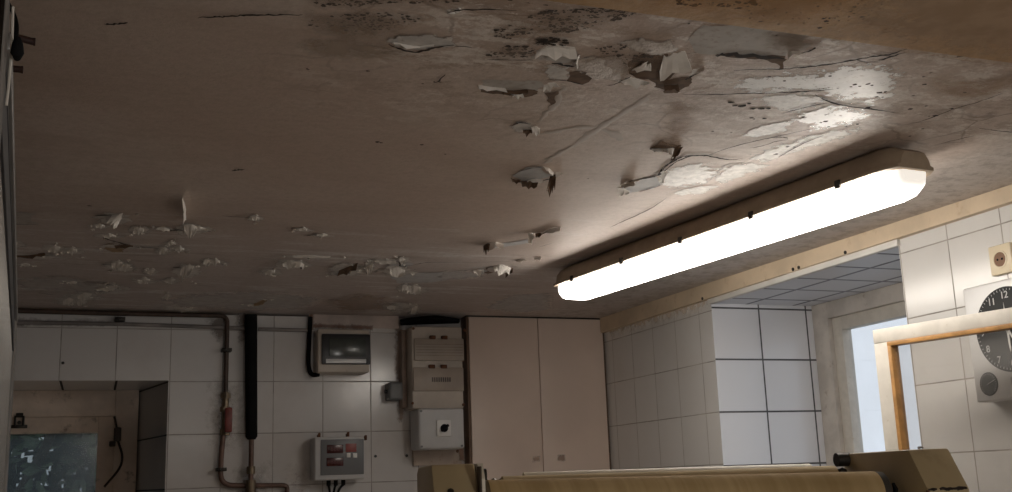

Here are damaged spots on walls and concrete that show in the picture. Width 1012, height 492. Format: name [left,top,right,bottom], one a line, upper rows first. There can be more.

leakage [308,0,460,32]
peeling [387,35,472,53]
leakage [486,5,635,58]
crack [734,49,906,71]
peeling [478,43,592,137]
peeling [606,25,905,226]
peeling [511,145,574,197]
peeling [37,197,216,307]
peeling [473,227,561,278]
peeling [257,255,443,314]